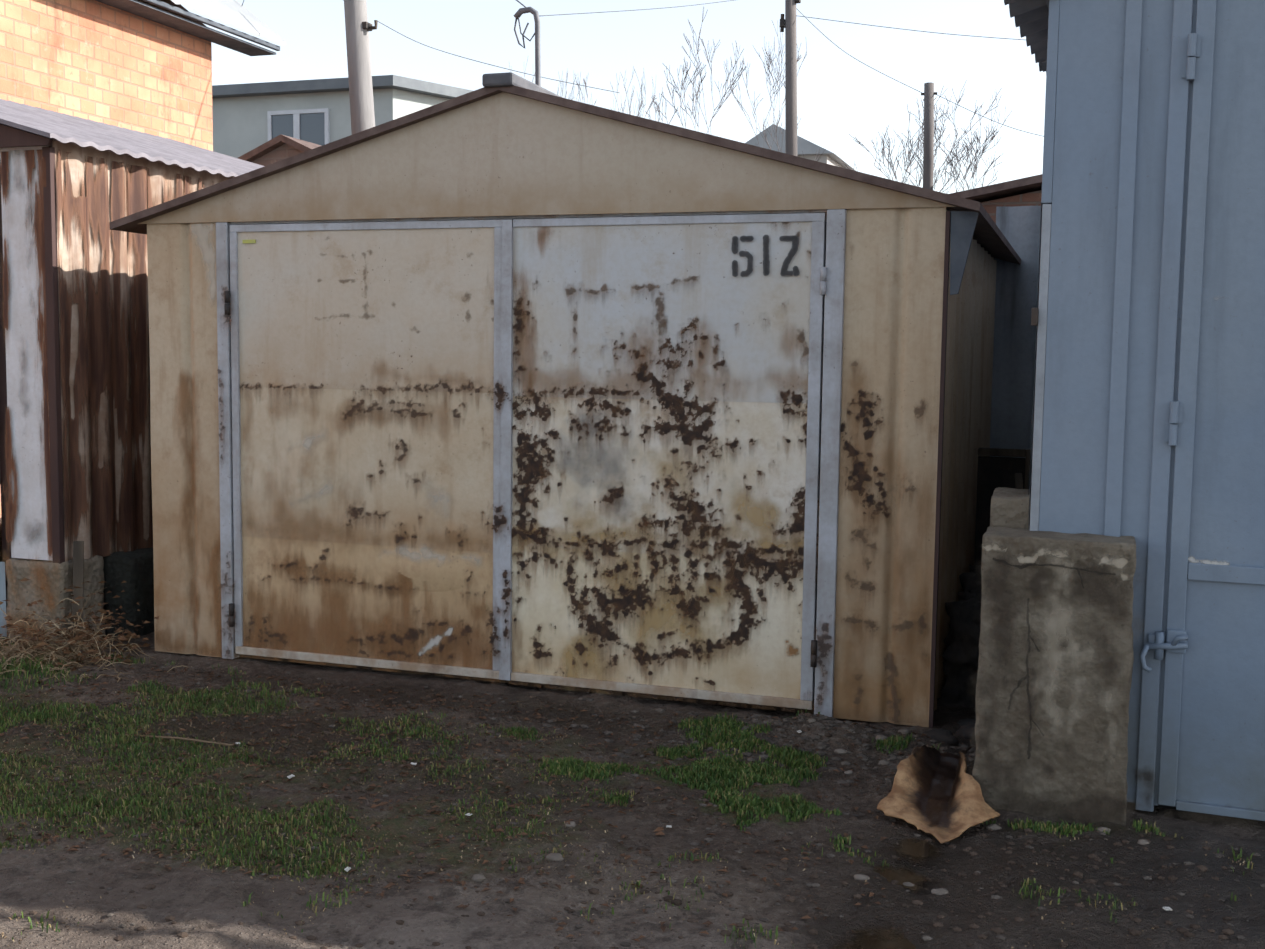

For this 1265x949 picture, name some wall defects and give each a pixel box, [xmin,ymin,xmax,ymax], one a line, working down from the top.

rust [0,151,9,203]
rust [24,149,204,557]
rust [3,407,18,543]
rust [201,276,819,693]
rust [840,390,890,592]
crack [993,558,1115,588]
crack [1008,598,1044,759]